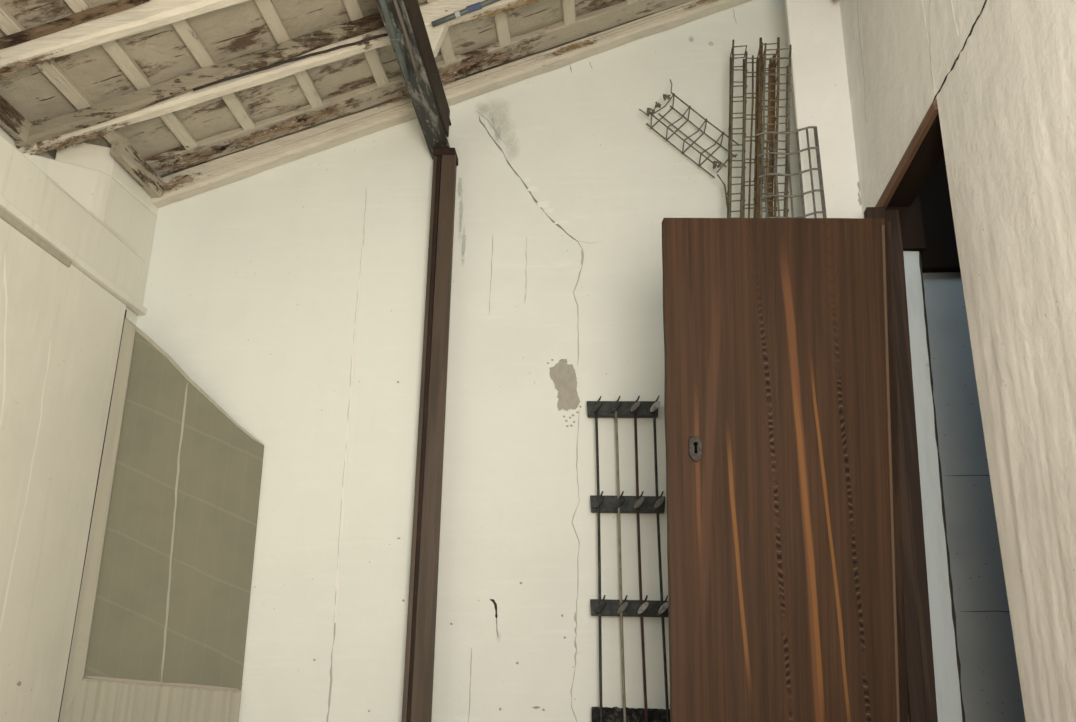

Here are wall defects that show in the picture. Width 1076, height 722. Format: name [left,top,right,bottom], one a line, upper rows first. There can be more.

peeling [0,50,73,80]
peeling [438,37,603,85]
crack [929,0,987,101]
peeling [22,122,129,155]
peeling [155,83,410,191]
crack [478,112,601,366]
spalling [547,358,581,427]
crack [570,409,580,721]
crack [466,649,474,722]